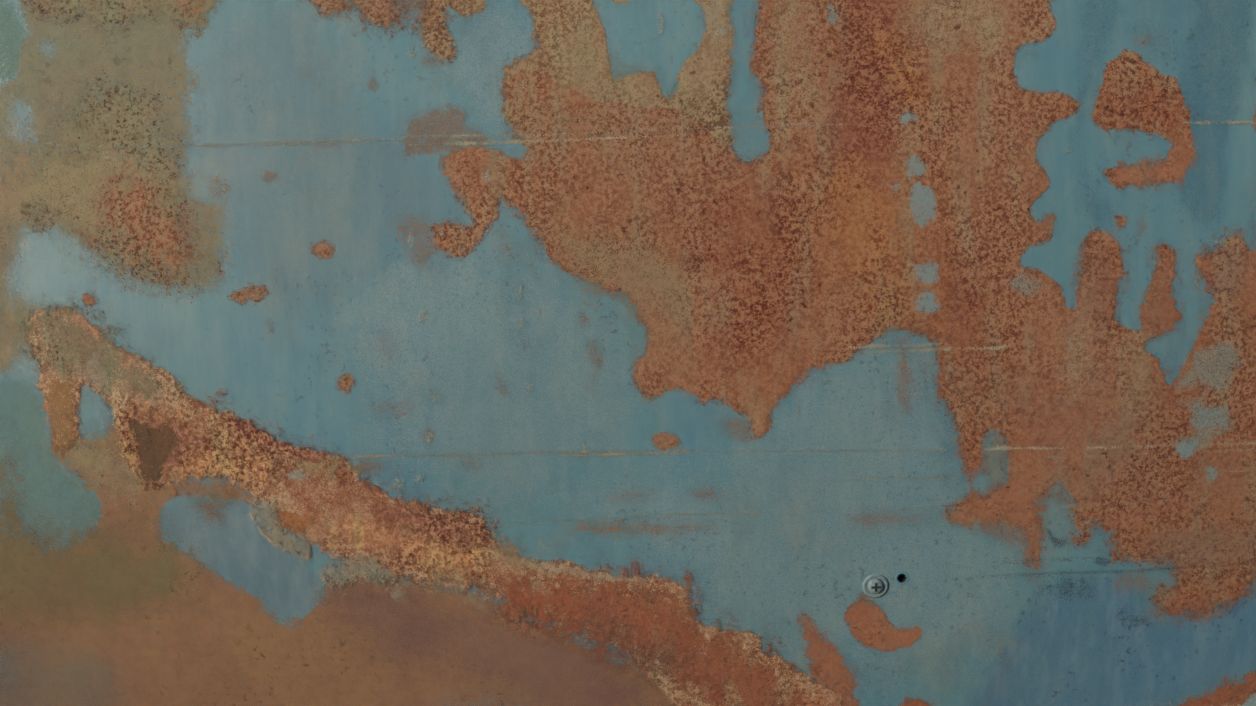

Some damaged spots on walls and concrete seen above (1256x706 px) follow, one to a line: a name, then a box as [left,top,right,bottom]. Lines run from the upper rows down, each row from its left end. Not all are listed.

rust [18,0,223,40]
rust [296,0,487,71]
rust [381,0,1256,629]
rust [0,66,922,706]
rust [898,694,937,706]
rust [1150,669,1256,706]